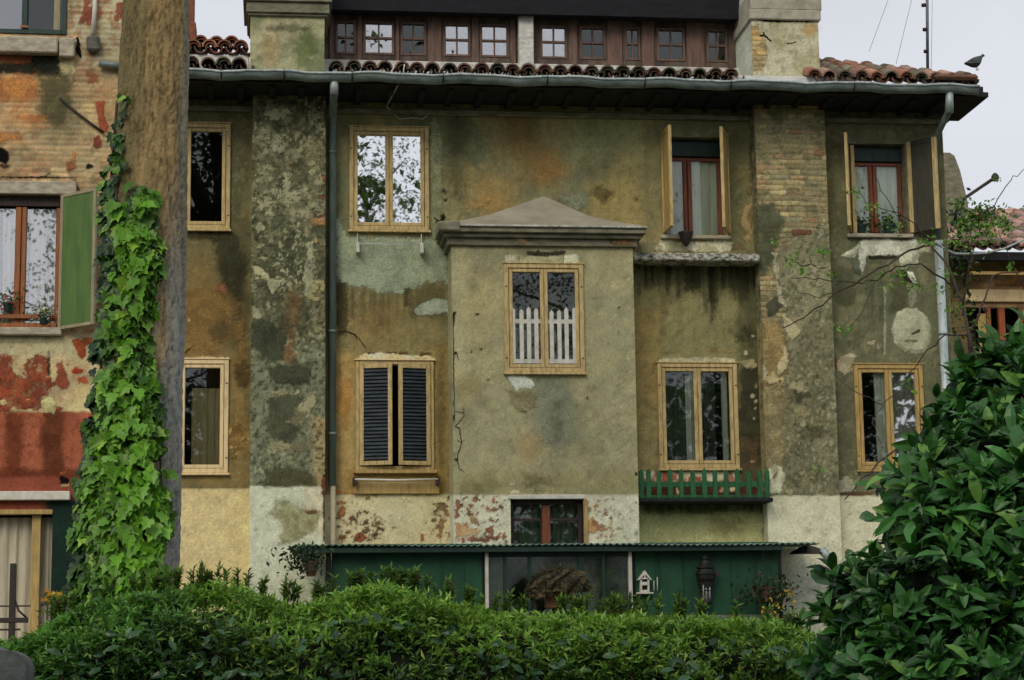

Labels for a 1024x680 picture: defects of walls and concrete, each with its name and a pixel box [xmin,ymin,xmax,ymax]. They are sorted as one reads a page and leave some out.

flaking render [841,238,931,283]
damp [638,266,755,351]
spalling [638,105,828,495]
peeling [0,336,93,414]
damp [251,320,317,453]
crack [453,312,464,471]
peeling [506,375,580,412]
damp [738,363,761,464]
peeling [336,494,395,542]
peeling [421,495,507,543]
peeling [588,499,638,542]